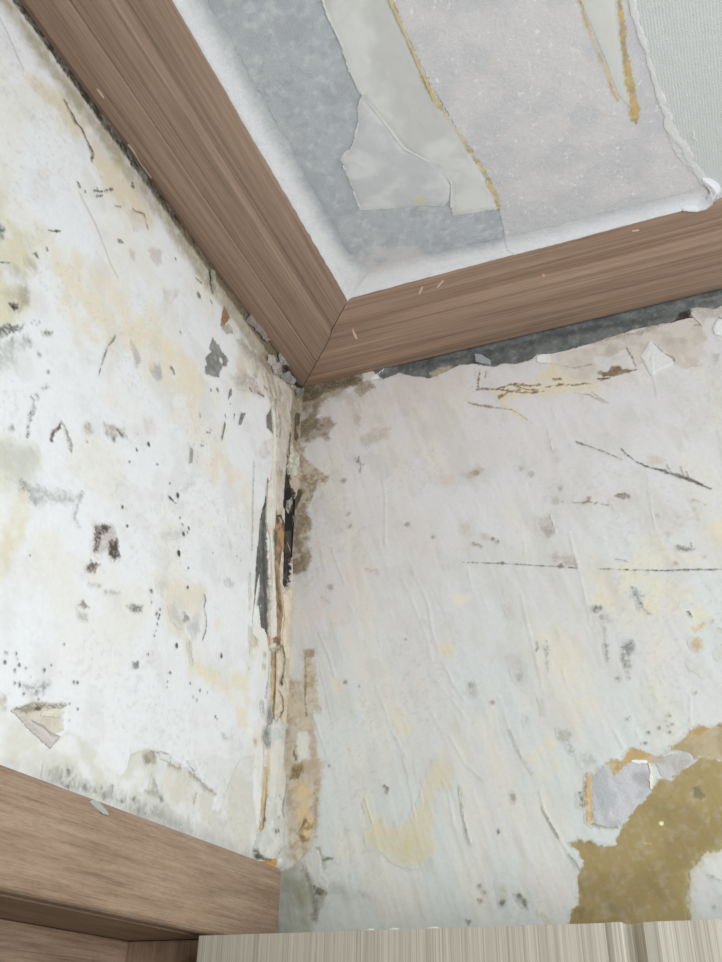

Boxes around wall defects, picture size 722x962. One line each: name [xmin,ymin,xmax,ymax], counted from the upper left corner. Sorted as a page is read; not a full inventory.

flaking render [153,361,176,383]
flaking render [188,270,271,464]
crack [475,368,605,404]
flaking render [371,289,722,404]
leakage [0,0,394,933]
peeling [252,353,304,725]
crack [462,561,722,572]